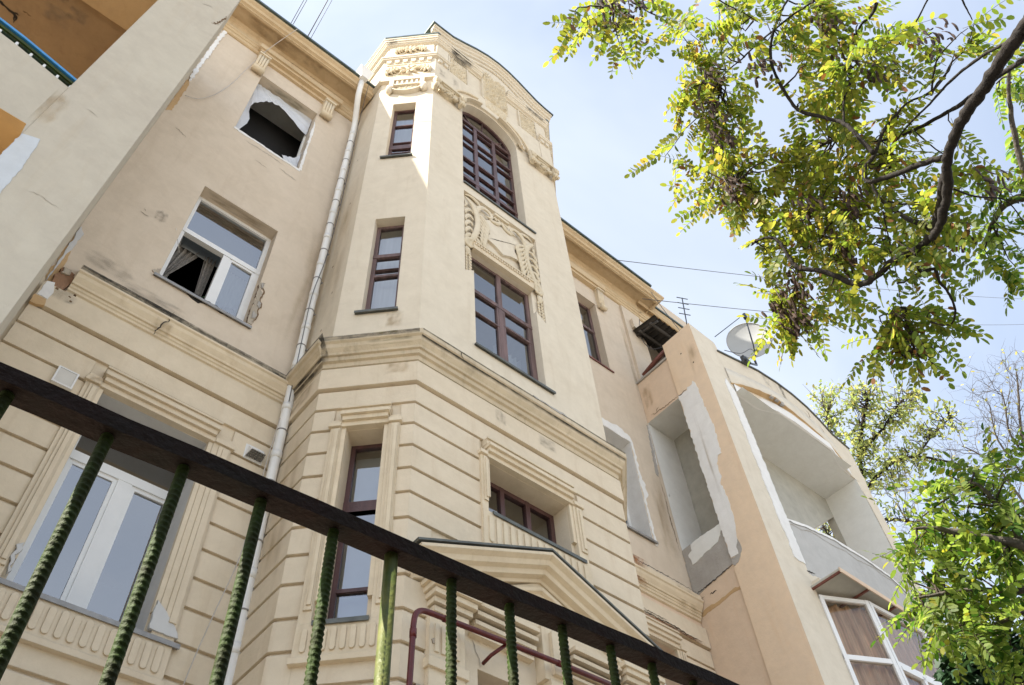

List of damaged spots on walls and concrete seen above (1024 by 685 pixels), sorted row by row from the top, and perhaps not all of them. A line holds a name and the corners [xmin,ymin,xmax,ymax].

spalling [46,236,77,302]
spalling [246,282,265,325]
spalling [682,530,742,595]